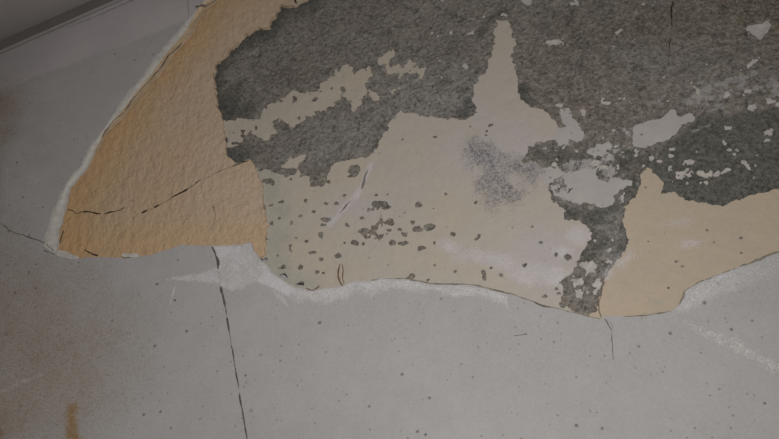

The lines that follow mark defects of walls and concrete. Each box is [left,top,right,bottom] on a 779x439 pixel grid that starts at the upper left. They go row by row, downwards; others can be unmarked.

crack [666,2,674,67]
crack [0,223,64,255]
crack [67,160,249,214]
spalling [44,0,779,319]
water stain [432,61,779,289]
crack [212,247,248,439]